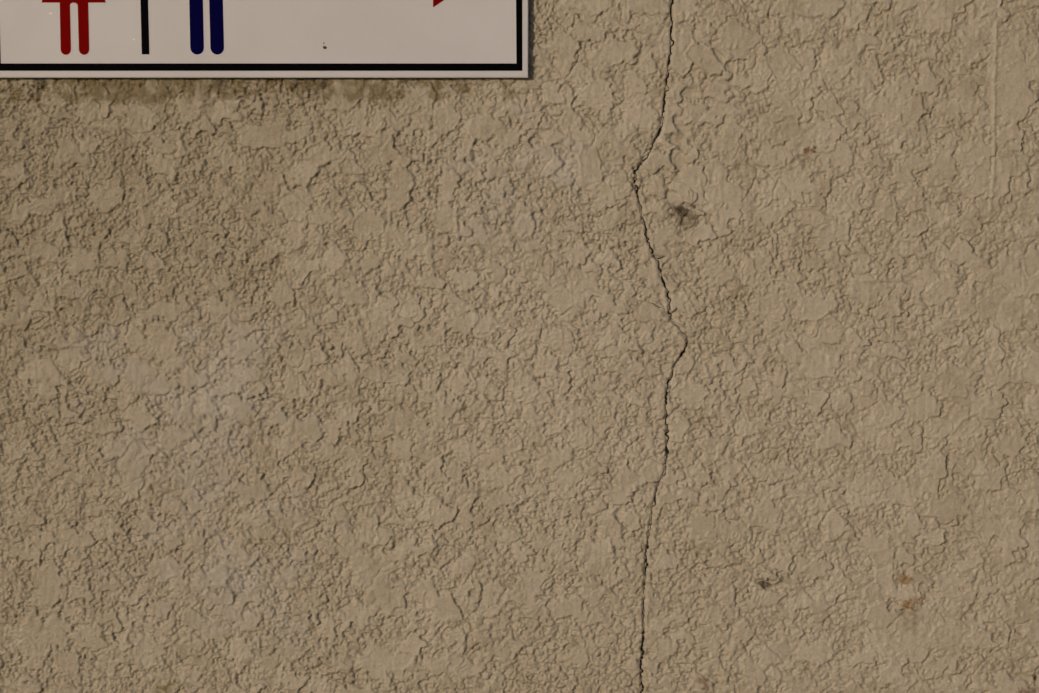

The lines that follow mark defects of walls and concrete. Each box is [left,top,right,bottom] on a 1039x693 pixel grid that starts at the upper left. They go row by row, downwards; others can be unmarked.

crack [633,0,688,693]